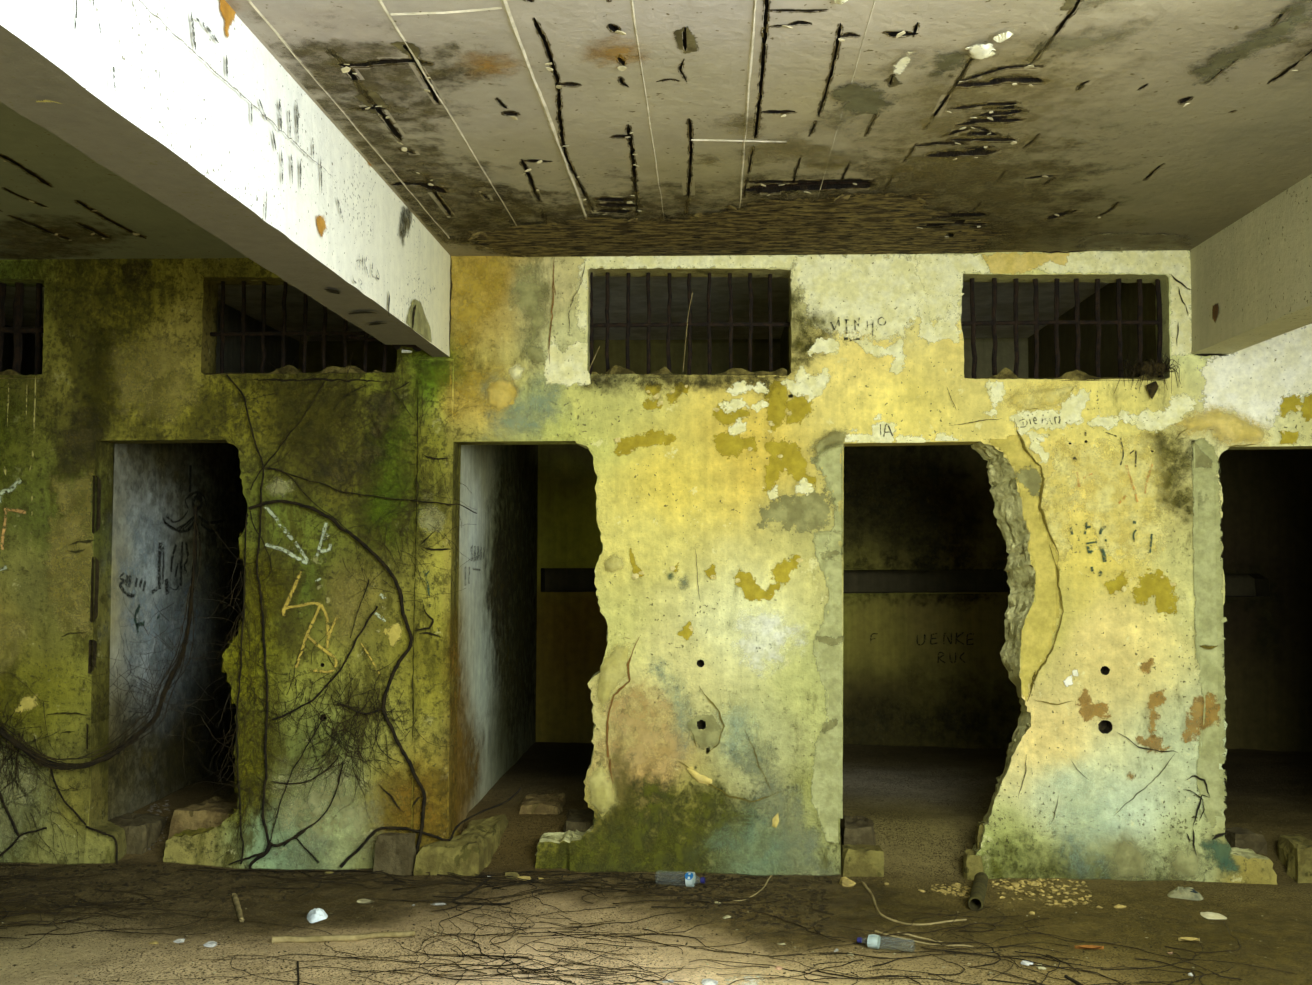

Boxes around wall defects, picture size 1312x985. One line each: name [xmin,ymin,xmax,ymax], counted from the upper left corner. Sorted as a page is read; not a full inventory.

corrosion [220,0,236,38]
crack [139,0,330,175]
spalling [922,31,1051,160]
damp [752,139,852,169]
corrosion [316,216,326,236]
peeling [543,336,690,410]
crack [947,388,1070,705]
spalling [712,337,964,843]
spalling [969,367,1227,828]
corrosion [1075,689,1112,722]
corrosion [1135,690,1221,753]
damp [0,764,31,839]